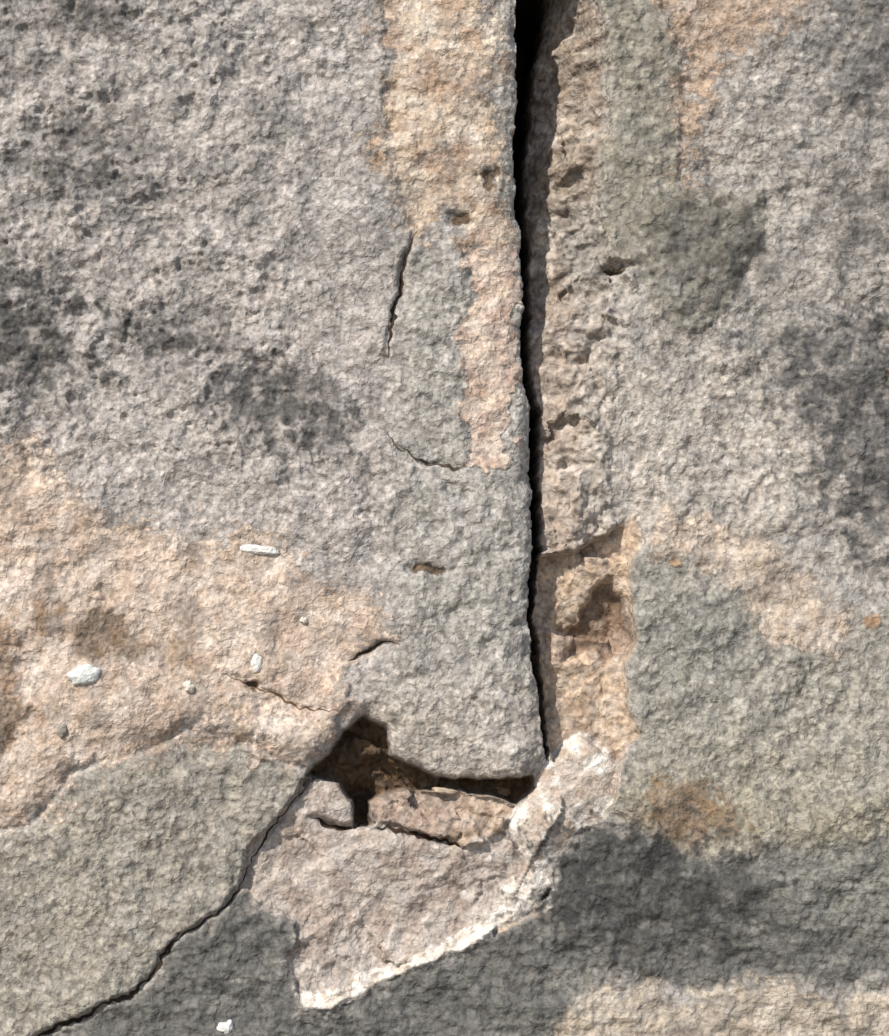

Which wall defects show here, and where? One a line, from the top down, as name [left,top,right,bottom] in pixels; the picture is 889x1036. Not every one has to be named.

crack [387,226,417,357]
spalling [0,420,554,1010]
crack [312,818,463,849]
crack [37,775,311,1036]
peeling [217,1019,234,1034]